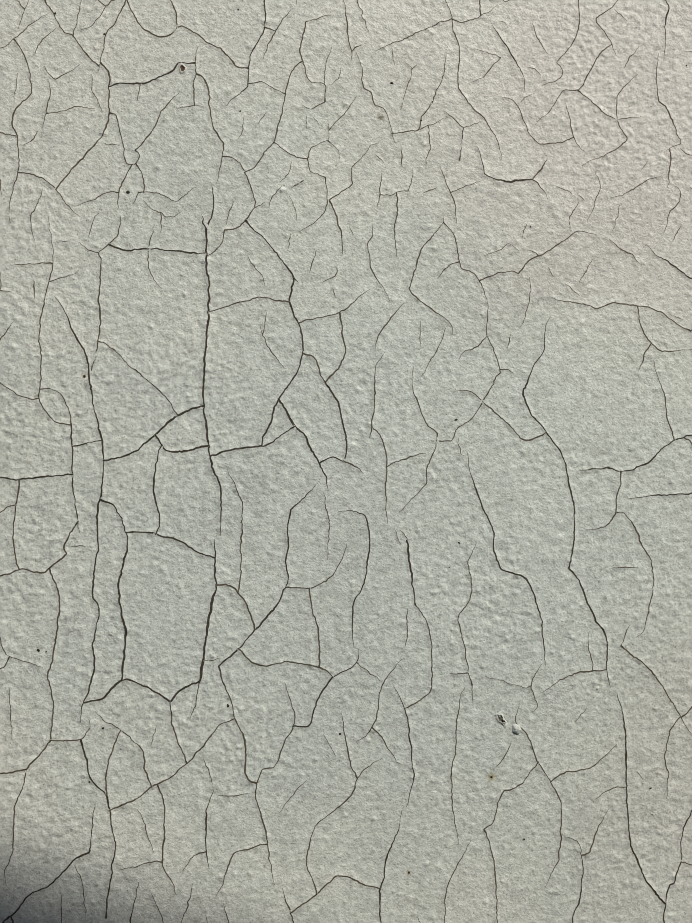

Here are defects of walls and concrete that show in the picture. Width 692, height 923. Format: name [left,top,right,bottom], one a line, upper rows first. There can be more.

crack [0,0,437,923]
crack [341,0,641,168]
crack [366,146,692,923]
crack [608,0,692,266]